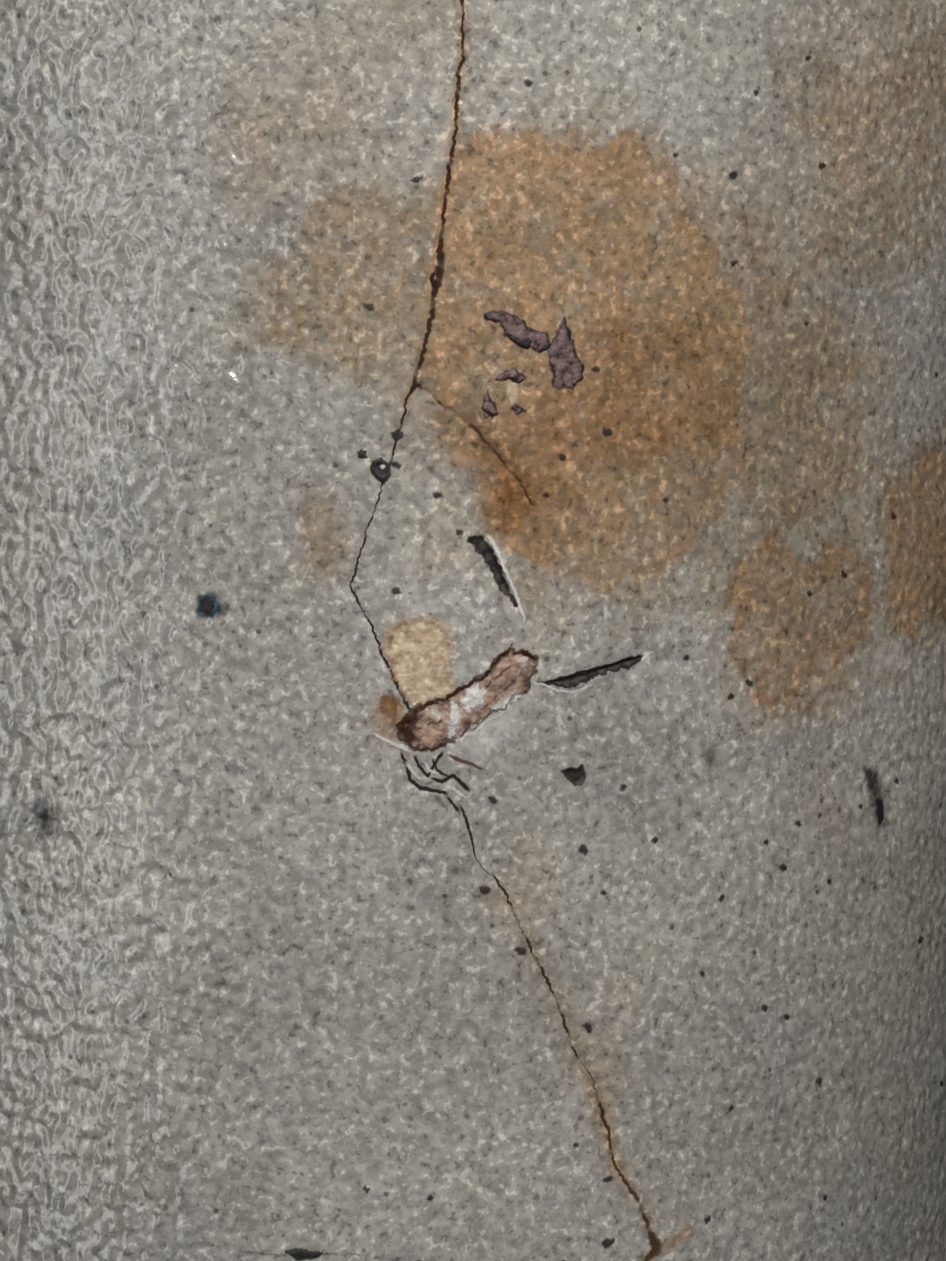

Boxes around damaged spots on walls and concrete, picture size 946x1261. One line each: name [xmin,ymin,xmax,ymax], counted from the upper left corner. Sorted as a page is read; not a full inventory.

crack [349,0,465,710]
peeling [481,368,527,419]
peeling [484,310,584,389]
crack [469,424,533,504]
spalling [467,535,525,623]
spalling [380,615,652,752]
crack [375,734,512,906]
crack [526,937,682,1261]